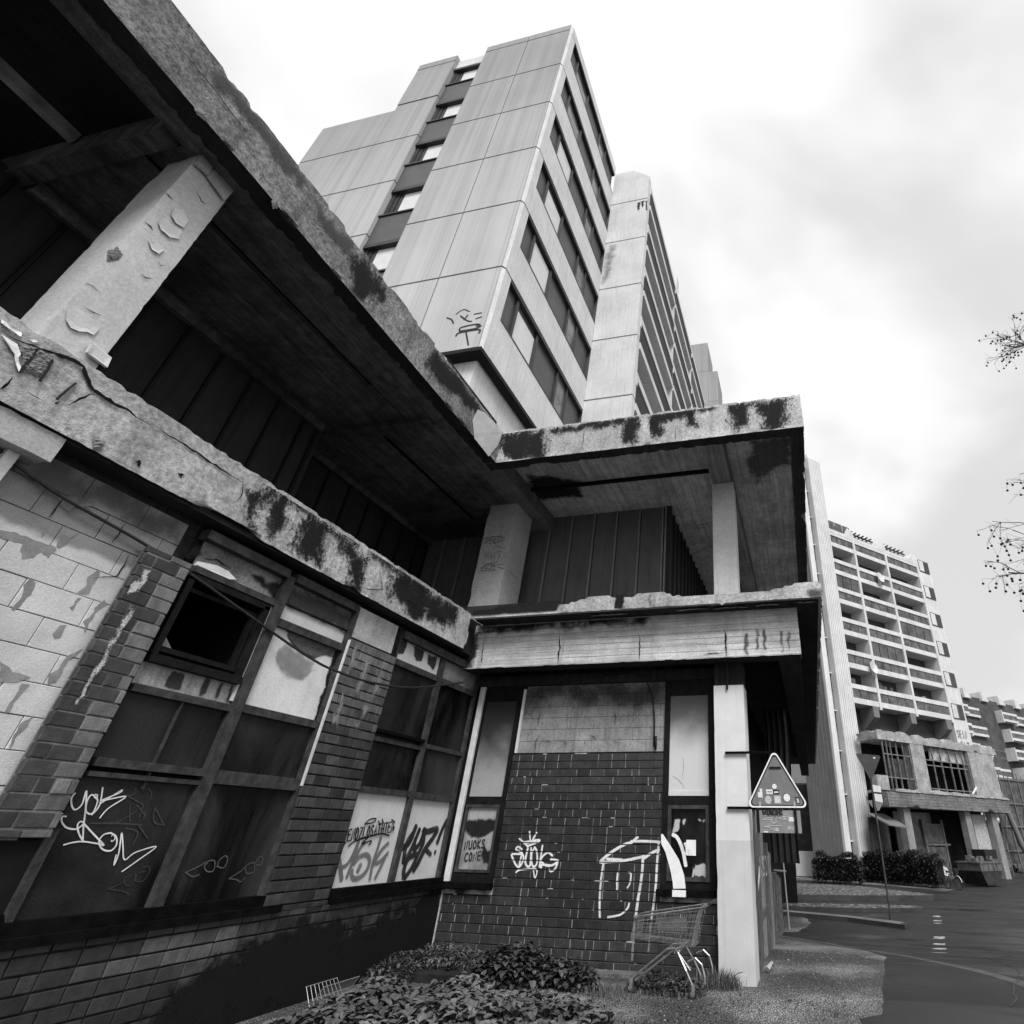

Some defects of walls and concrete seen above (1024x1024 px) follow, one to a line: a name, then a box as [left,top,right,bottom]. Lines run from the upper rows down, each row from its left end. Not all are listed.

damp [212,70,306,187]
spalling [106,246,123,262]
peeling [149,208,189,254]
damp [314,200,389,306]
spalling [1,320,54,381]
peeling [66,309,112,368]
crack [0,330,243,503]
damp [499,397,797,483]
damp [127,570,151,593]
damp [241,483,648,670]
damp [75,606,133,704]
damp [744,630,767,653]